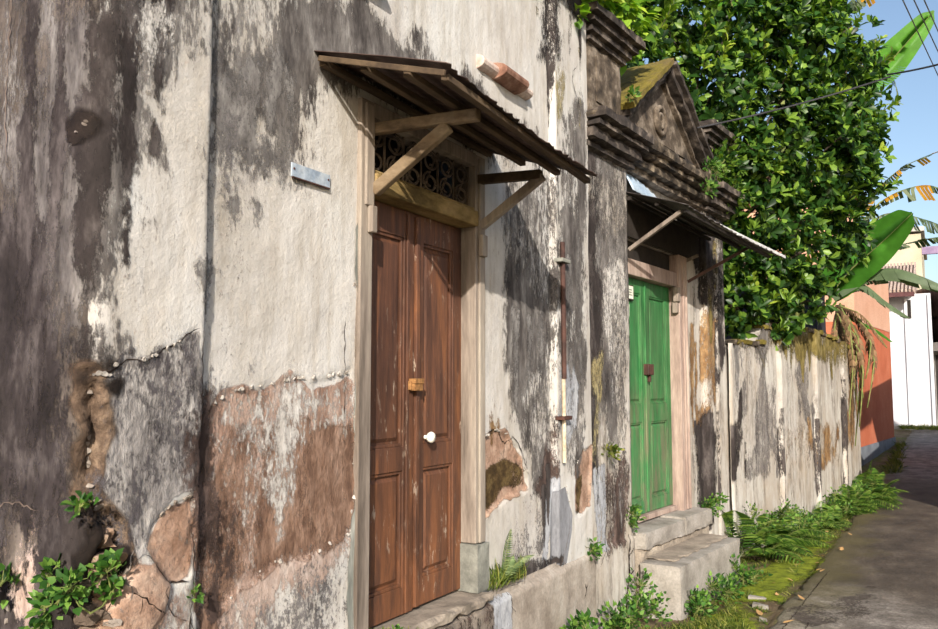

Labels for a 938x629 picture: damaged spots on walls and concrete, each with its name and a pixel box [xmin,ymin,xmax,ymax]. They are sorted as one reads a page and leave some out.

crack [90,328,205,629]
peeling [69,331,356,629]
leakage [0,0,437,629]
spalling [485,428,529,518]
leakage [501,0,630,580]
leakage [693,235,859,532]
crack [782,575,826,629]